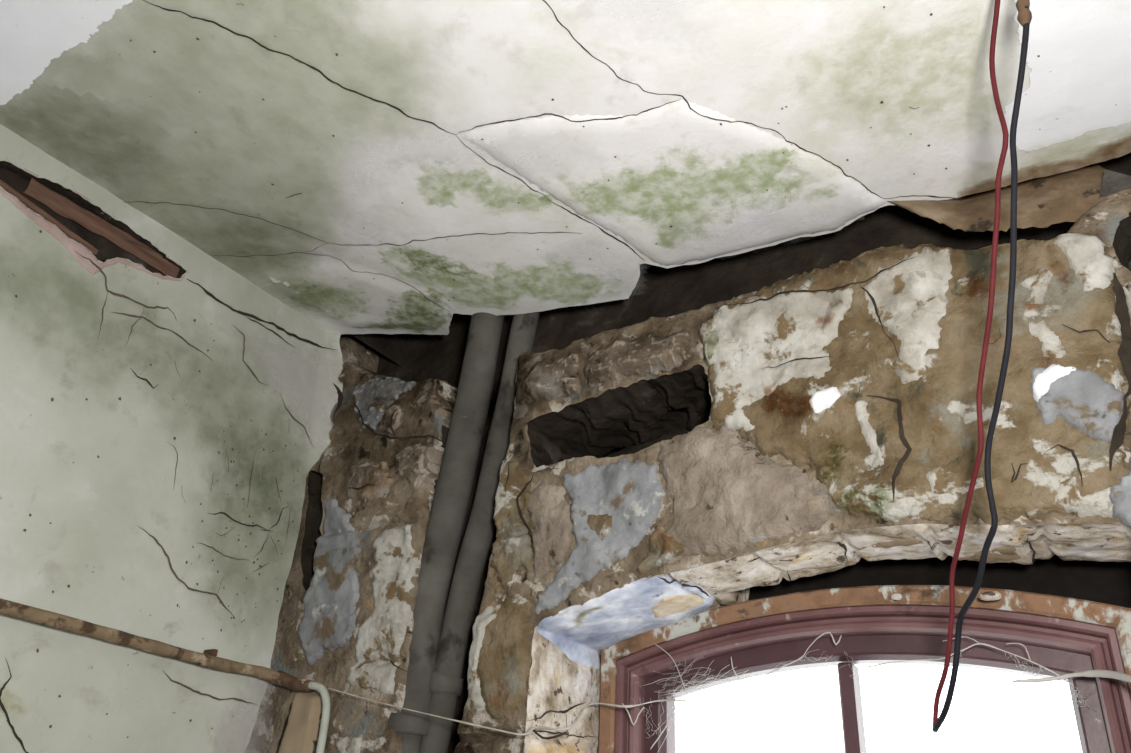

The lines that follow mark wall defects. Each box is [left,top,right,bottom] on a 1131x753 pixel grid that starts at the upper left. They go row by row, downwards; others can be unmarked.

spalling [0,161,189,281]
crack [135,0,959,308]
crack [75,251,213,389]
crack [187,279,337,475]
peeling [352,376,416,435]
peeling [467,165,1131,721]
crack [725,256,917,360]
crack [855,388,912,501]
crack [138,442,291,619]
peeling [298,444,444,695]
crack [0,658,29,753]
peeling [335,735,362,753]